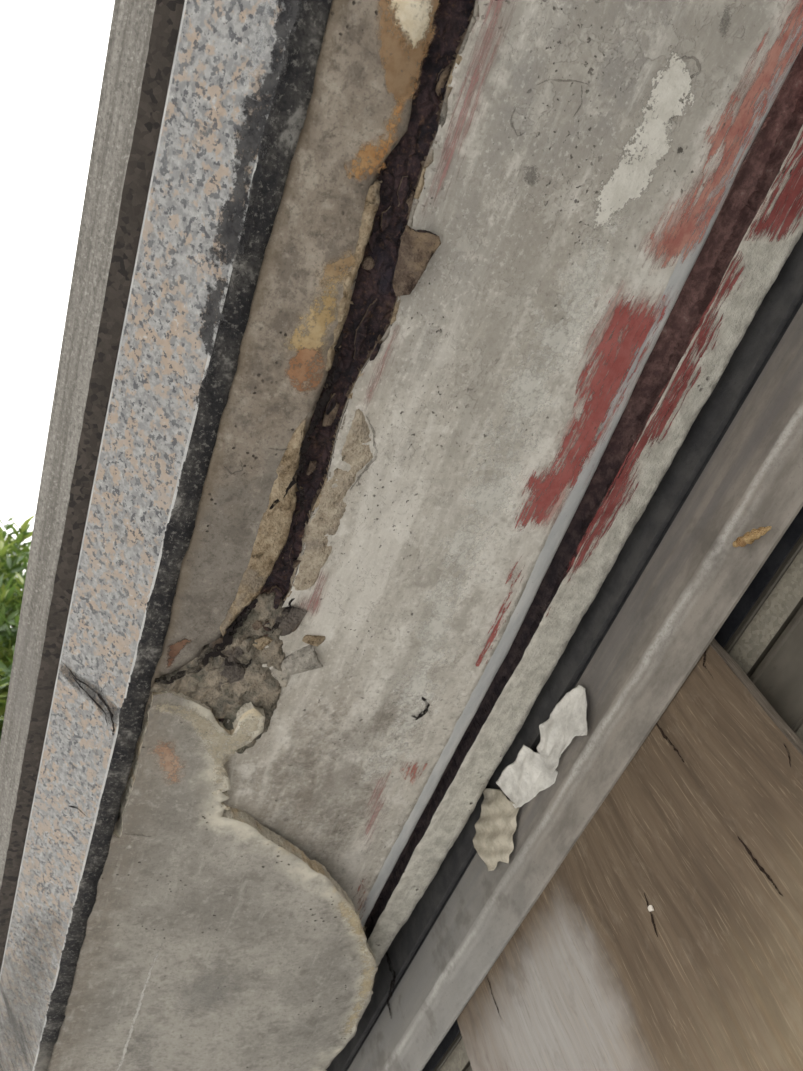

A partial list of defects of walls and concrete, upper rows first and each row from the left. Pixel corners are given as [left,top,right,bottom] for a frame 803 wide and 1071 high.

peeling [645,0,803,268]
crack [270,331,343,516]
spalling [144,0,503,754]
peeling [561,131,803,583]
crack [63,663,115,735]
crack [155,599,258,685]
crack [272,598,295,633]